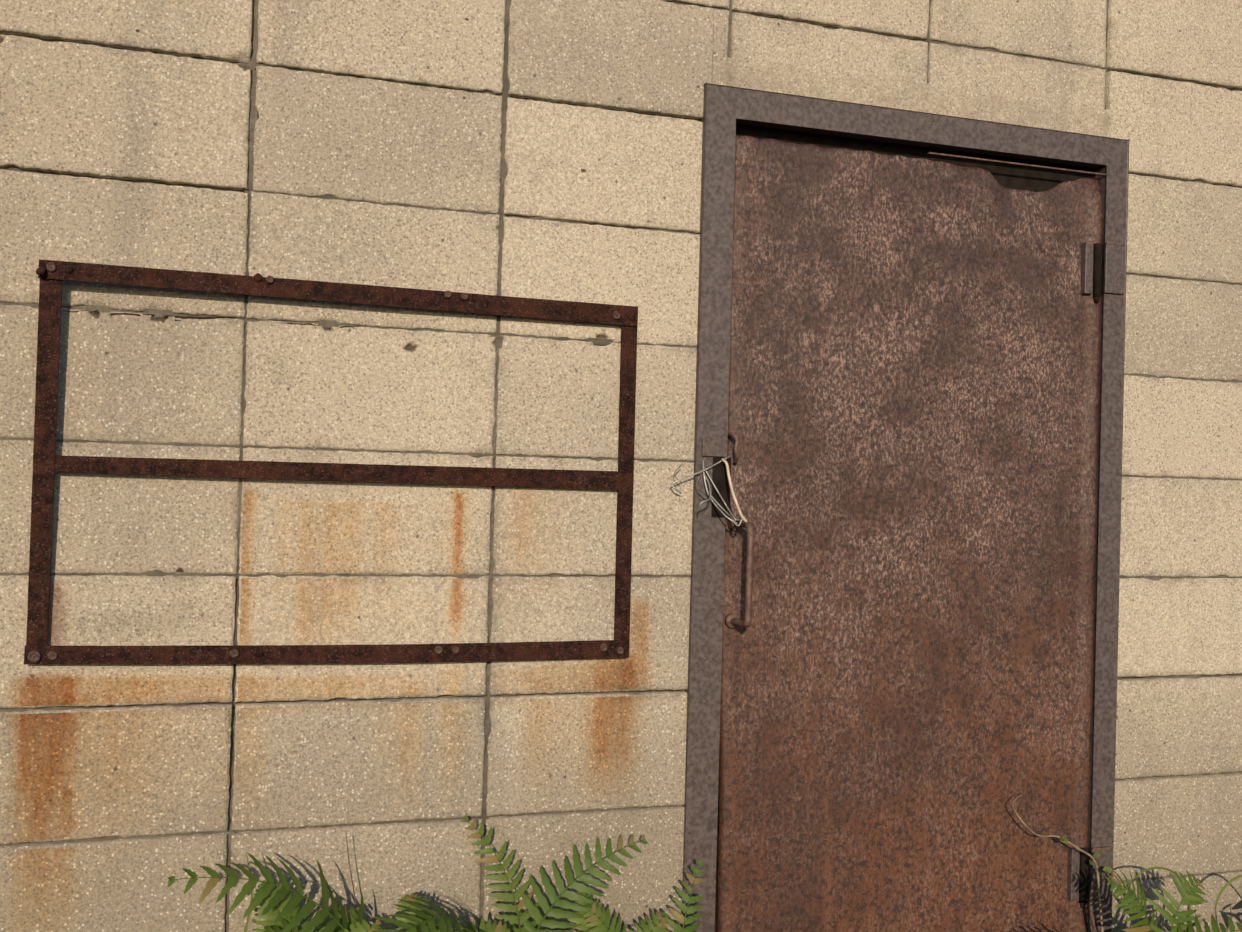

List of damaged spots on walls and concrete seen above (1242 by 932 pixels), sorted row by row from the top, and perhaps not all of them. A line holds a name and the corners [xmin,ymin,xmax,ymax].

crack [61,310,232,321]
crack [286,322,358,330]
corrosion [180,485,590,645]
corrosion [48,578,77,646]
corrosion [0,597,672,932]